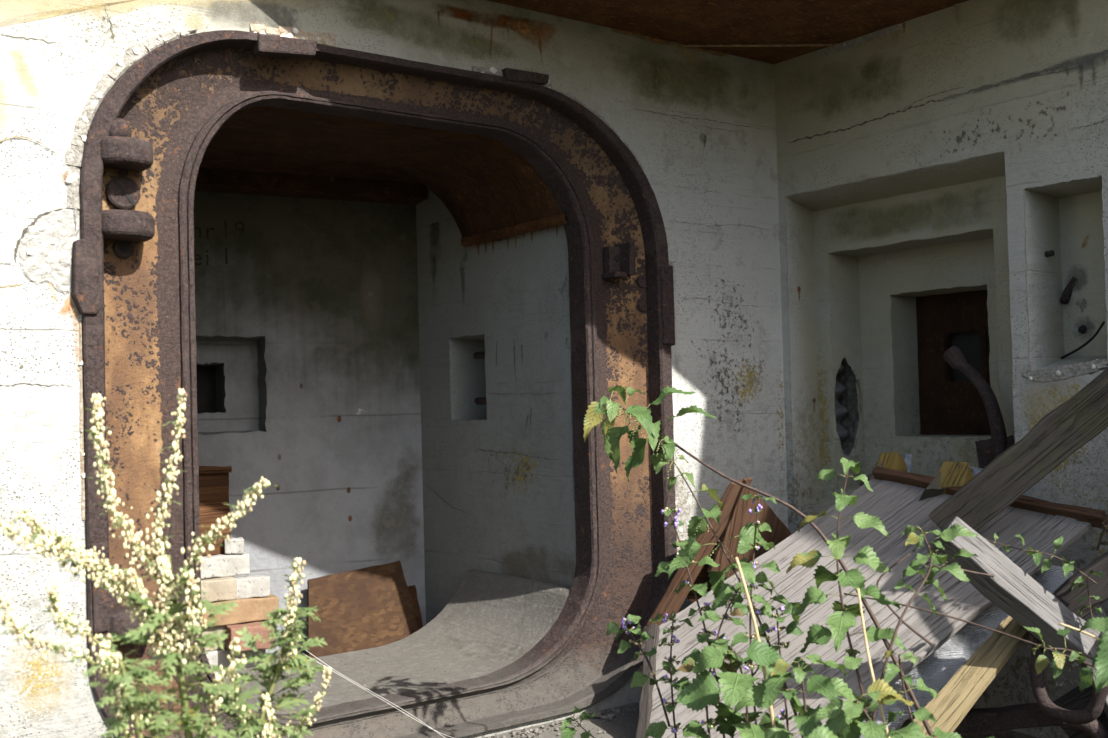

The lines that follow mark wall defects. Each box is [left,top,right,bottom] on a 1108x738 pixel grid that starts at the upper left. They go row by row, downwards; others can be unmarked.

corrosion [438,6,554,53]
crack [635,50,1108,143]
crack [0,136,61,156]
spalling [14,26,198,295]
crack [0,381,72,389]
spalling [836,358,859,456]